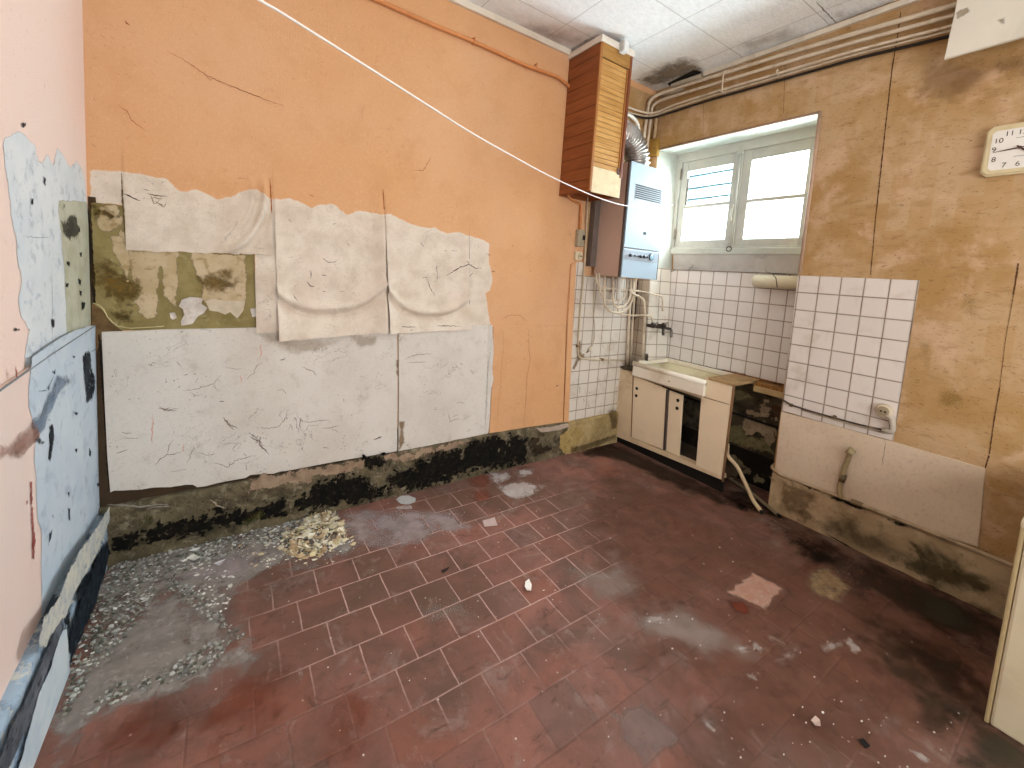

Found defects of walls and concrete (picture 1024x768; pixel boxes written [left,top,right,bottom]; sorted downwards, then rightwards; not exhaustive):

crack [168,51,284,106]
damp [642,60,700,85]
peeling [291,193,497,434]
peeling [3,132,365,768]
flaking render [378,428,470,462]
peeling [742,399,779,447]
damp [783,485,819,519]
damp [826,522,990,592]
damp [0,422,554,768]